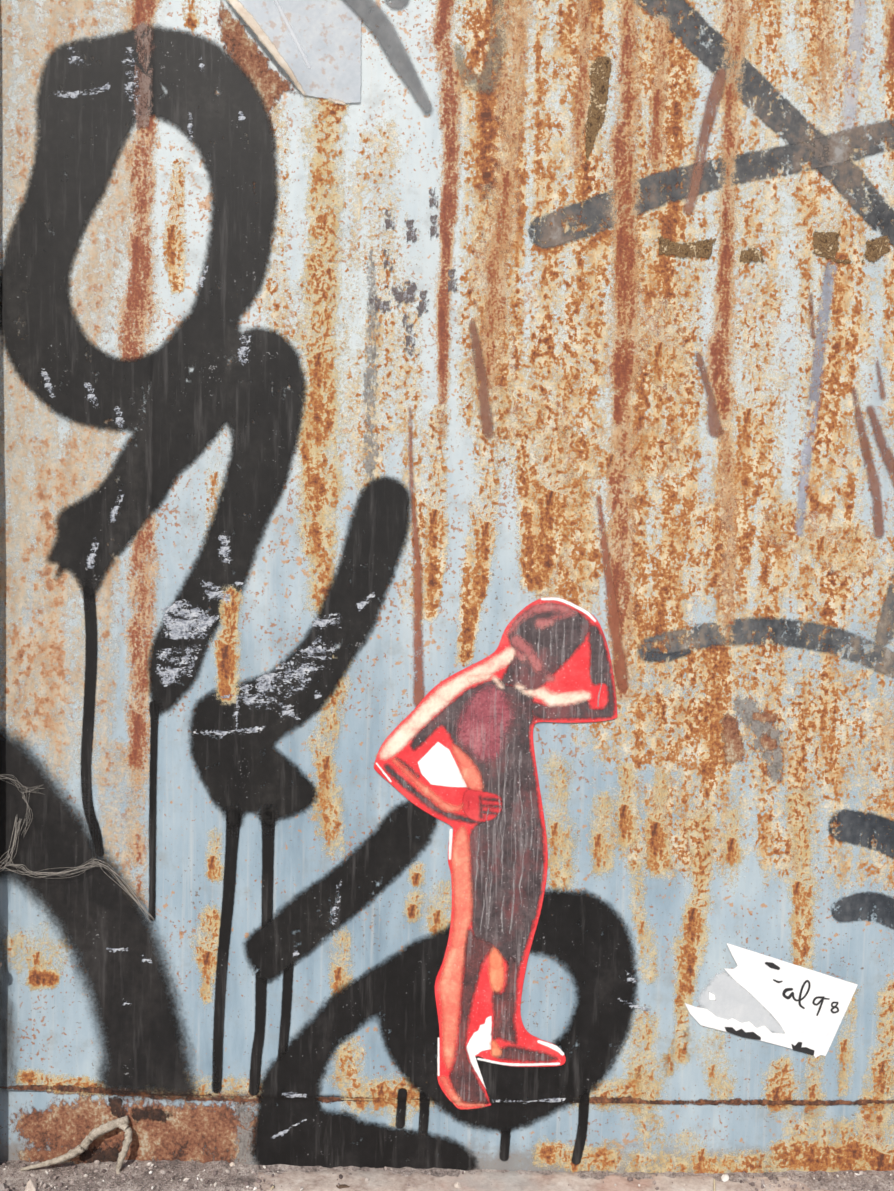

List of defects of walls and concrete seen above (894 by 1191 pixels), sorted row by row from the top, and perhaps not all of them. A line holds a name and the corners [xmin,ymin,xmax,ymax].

rust [182,0,201,32]
rust [0,0,186,361]
rust [203,472,224,535]
rust [0,330,160,900]
rust [214,0,894,1174]
rust [205,828,224,882]
rust [191,905,221,1004]
rust [0,1069,262,1165]